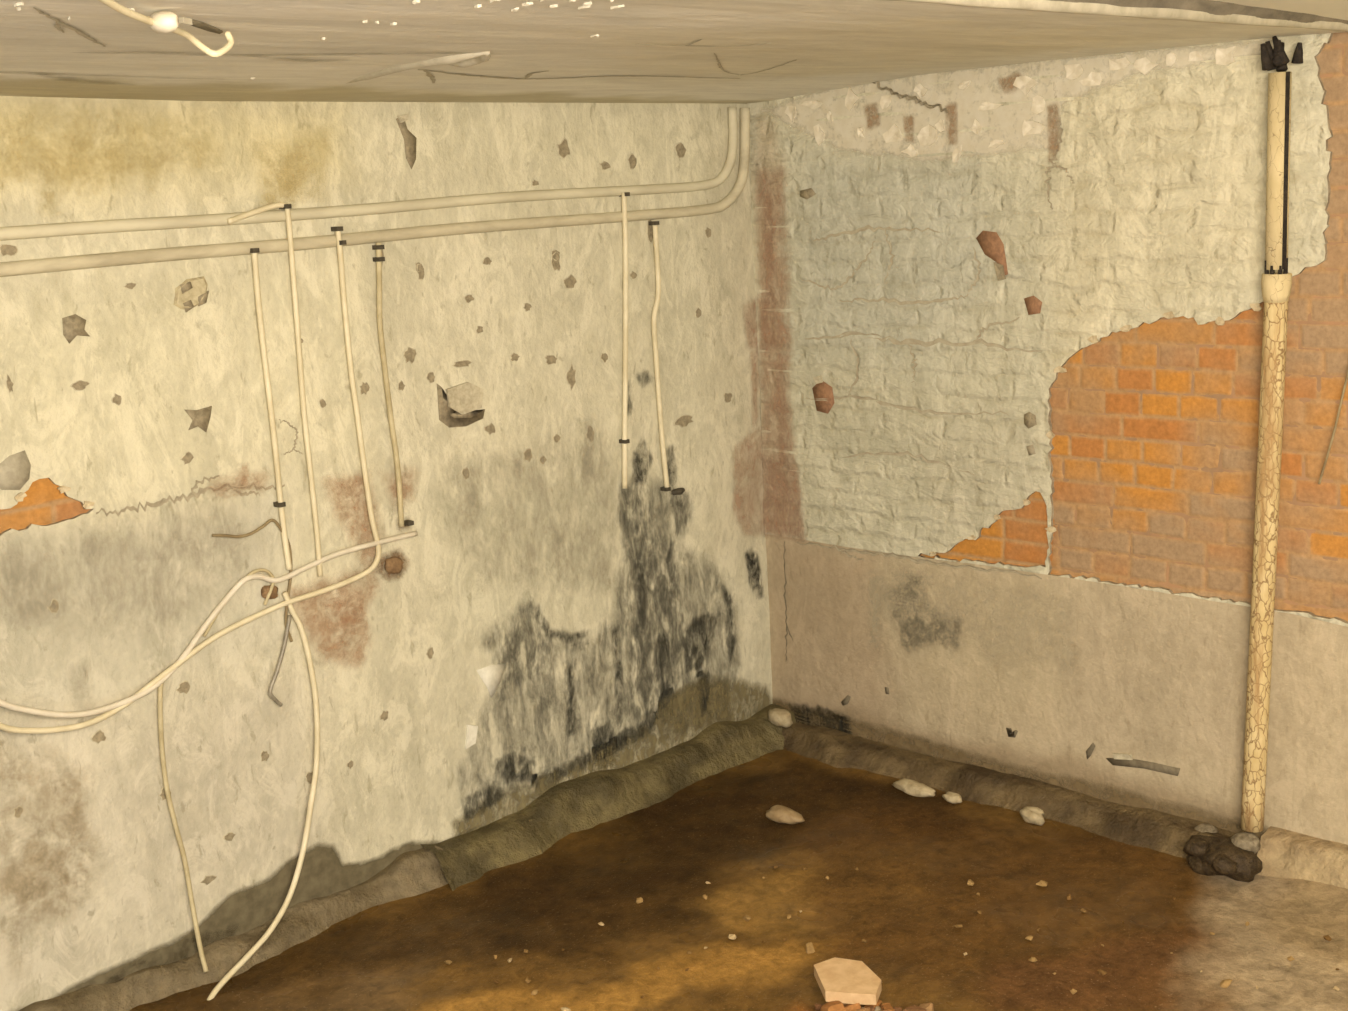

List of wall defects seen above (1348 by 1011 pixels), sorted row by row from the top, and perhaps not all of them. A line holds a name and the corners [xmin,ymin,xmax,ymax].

spalling [1024,296,1042,315]
flaking render [1274,32,1348,621]
flaking render [0,450,95,533]
damp [633,453,651,482]
flaking render [920,302,1264,603]
damp [464,459,735,834]
damp [59,842,438,996]